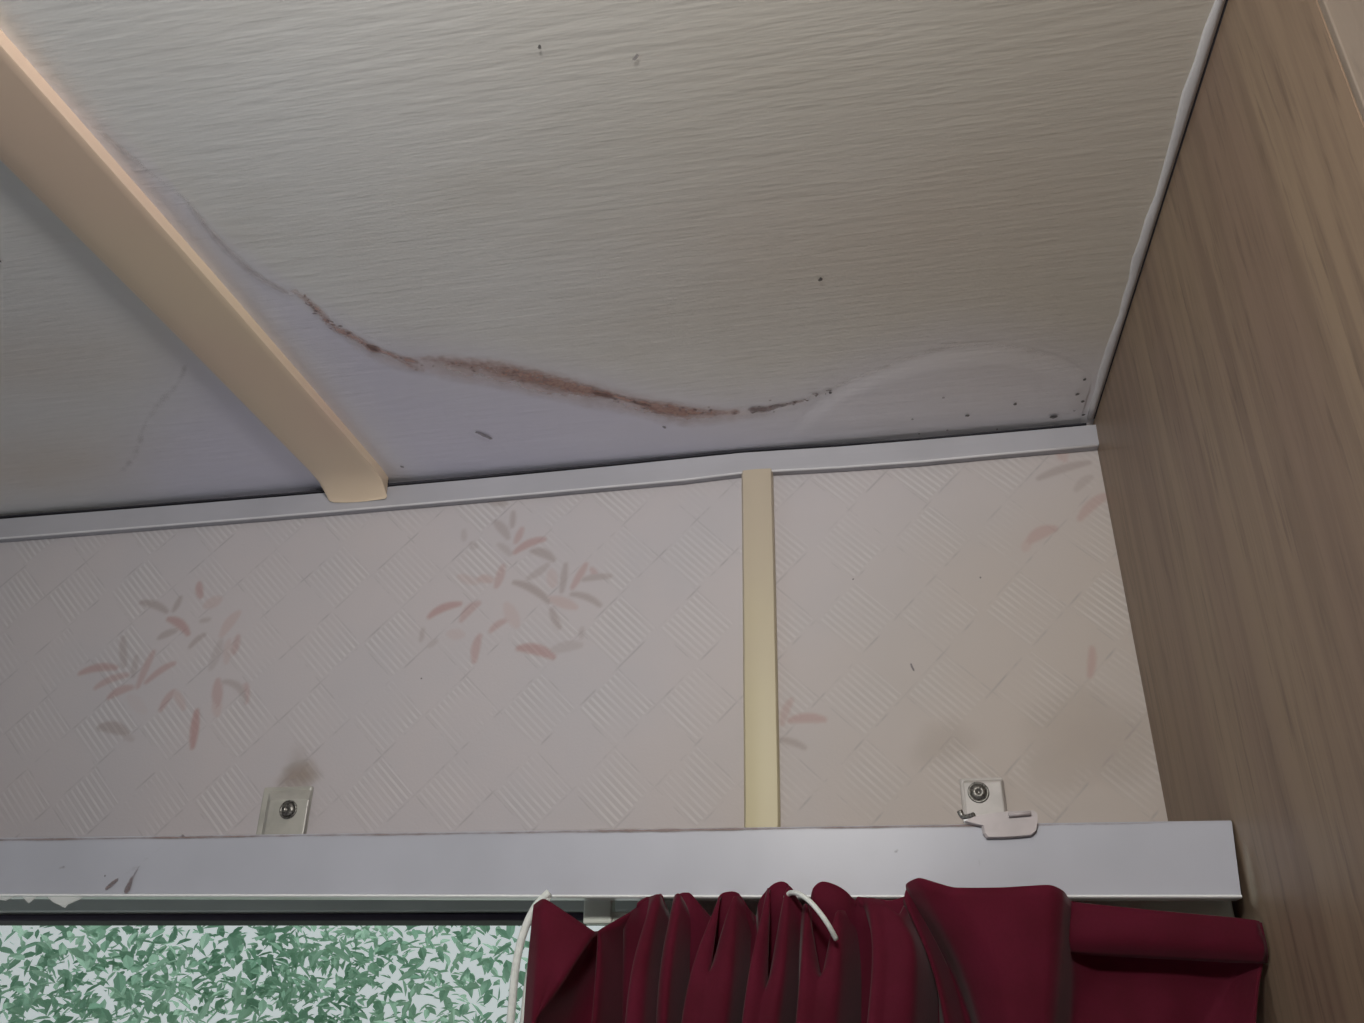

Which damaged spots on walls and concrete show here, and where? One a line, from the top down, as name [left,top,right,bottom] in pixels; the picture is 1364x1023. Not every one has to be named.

damp [304,295,414,362]
damp [462,363,712,416]
damp [734,390,832,414]